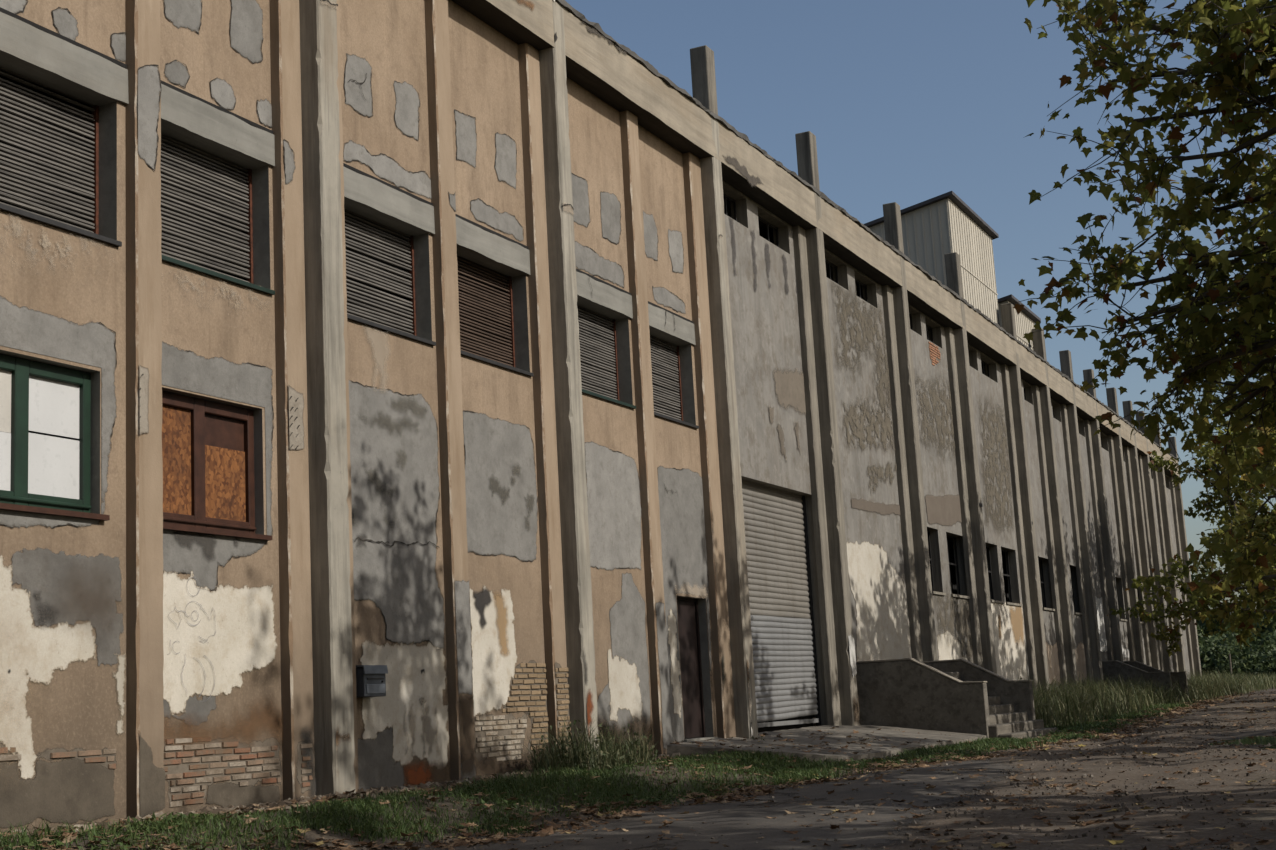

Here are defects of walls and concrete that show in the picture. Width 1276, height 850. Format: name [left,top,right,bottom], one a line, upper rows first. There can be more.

peeling [0,555,117,779]
peeling [113,654,127,735]
peeling [163,570,278,715]
peeling [360,640,449,767]
peeling [470,586,572,762]
peeling [607,648,643,722]
peeling [846,541,912,677]
peeling [991,599,1028,682]
flaking render [163,734,313,807]